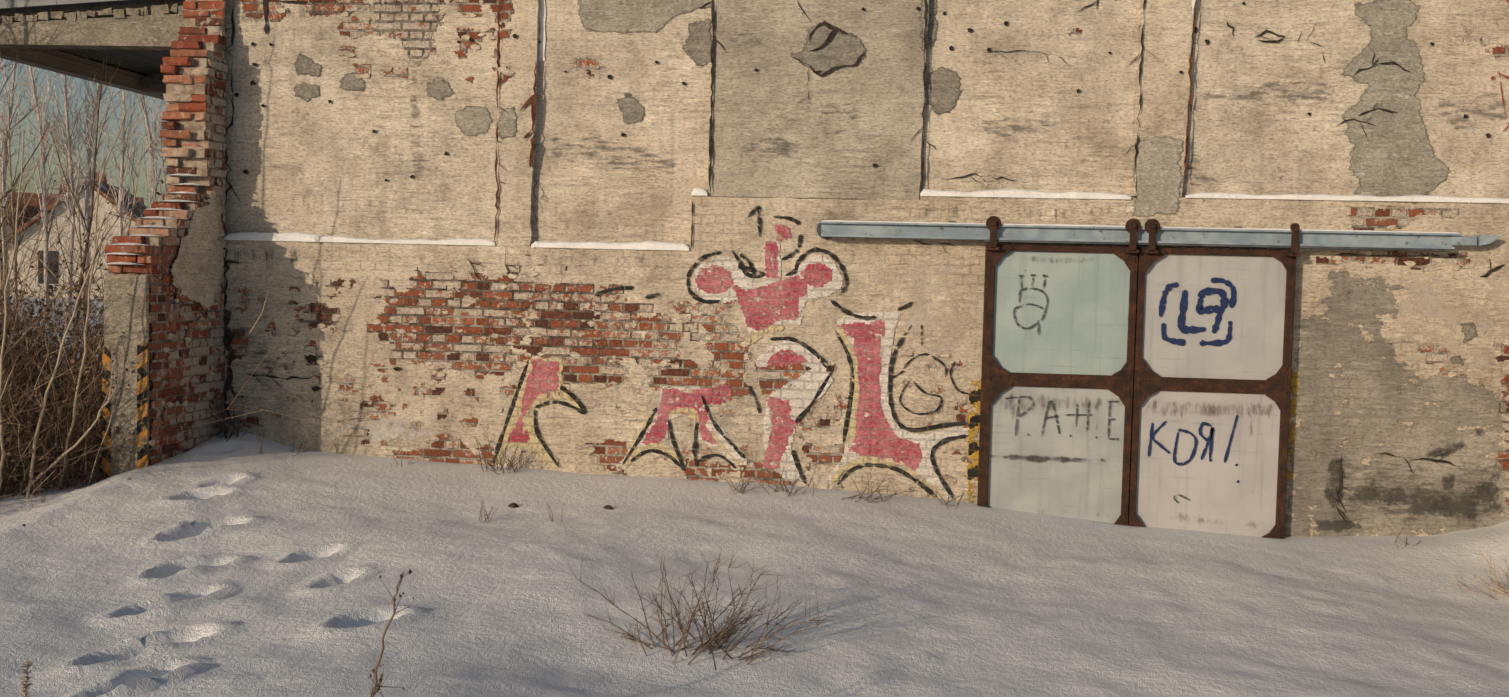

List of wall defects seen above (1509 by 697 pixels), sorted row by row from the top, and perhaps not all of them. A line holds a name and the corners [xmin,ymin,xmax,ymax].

flaking render [240,0,517,84]
crack [223,0,315,426]
flaking render [1349,205,1460,231]
flaking render [224,301,276,366]
flaking render [288,278,355,366]
flaking render [338,254,836,466]
flaking render [1284,250,1509,537]
flaking render [586,439,627,476]
corrosion [992,455,1103,463]